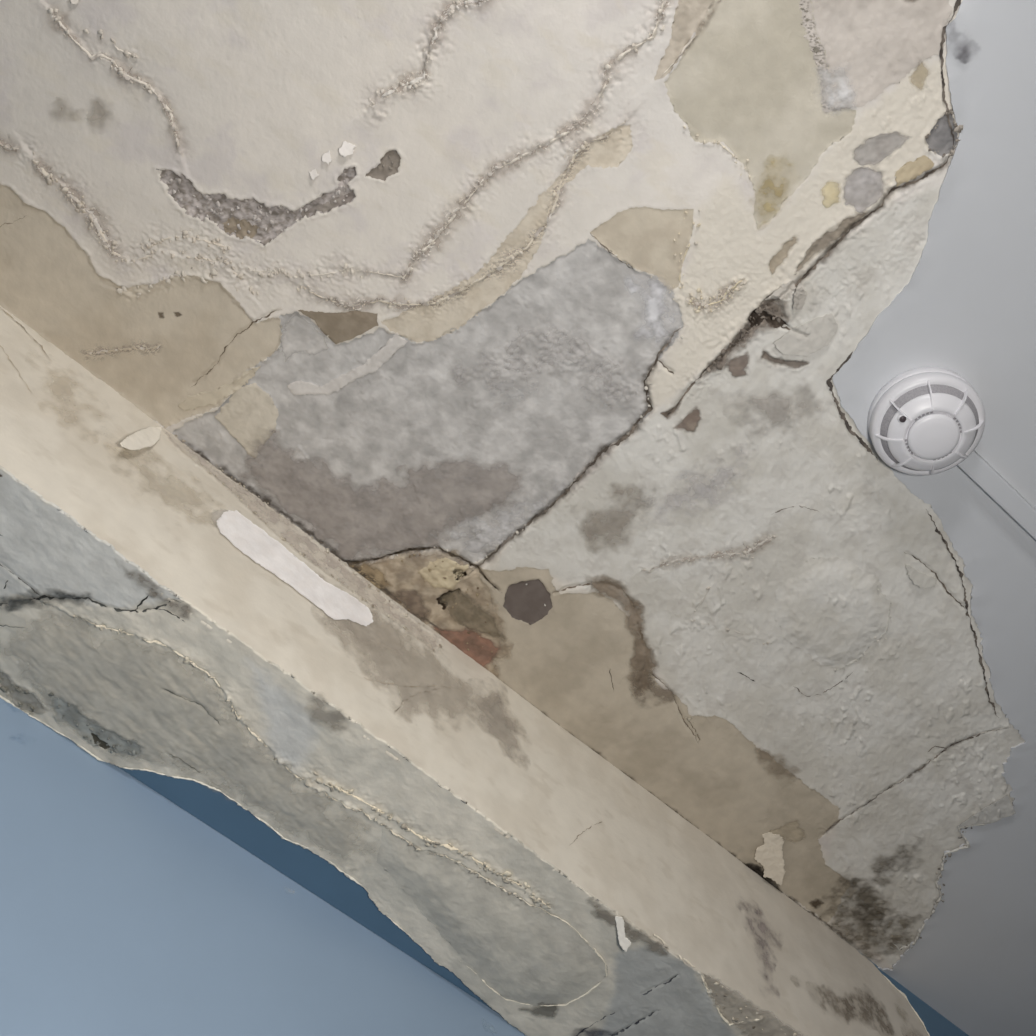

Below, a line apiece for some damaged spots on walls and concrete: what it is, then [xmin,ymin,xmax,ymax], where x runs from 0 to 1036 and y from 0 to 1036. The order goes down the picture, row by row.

crack [351,0,961,593]
crack [0,564,184,629]
peeling [0,465,750,1036]
spalling [701,975,802,1036]
damp [811,850,910,958]
crack [817,514,1006,839]